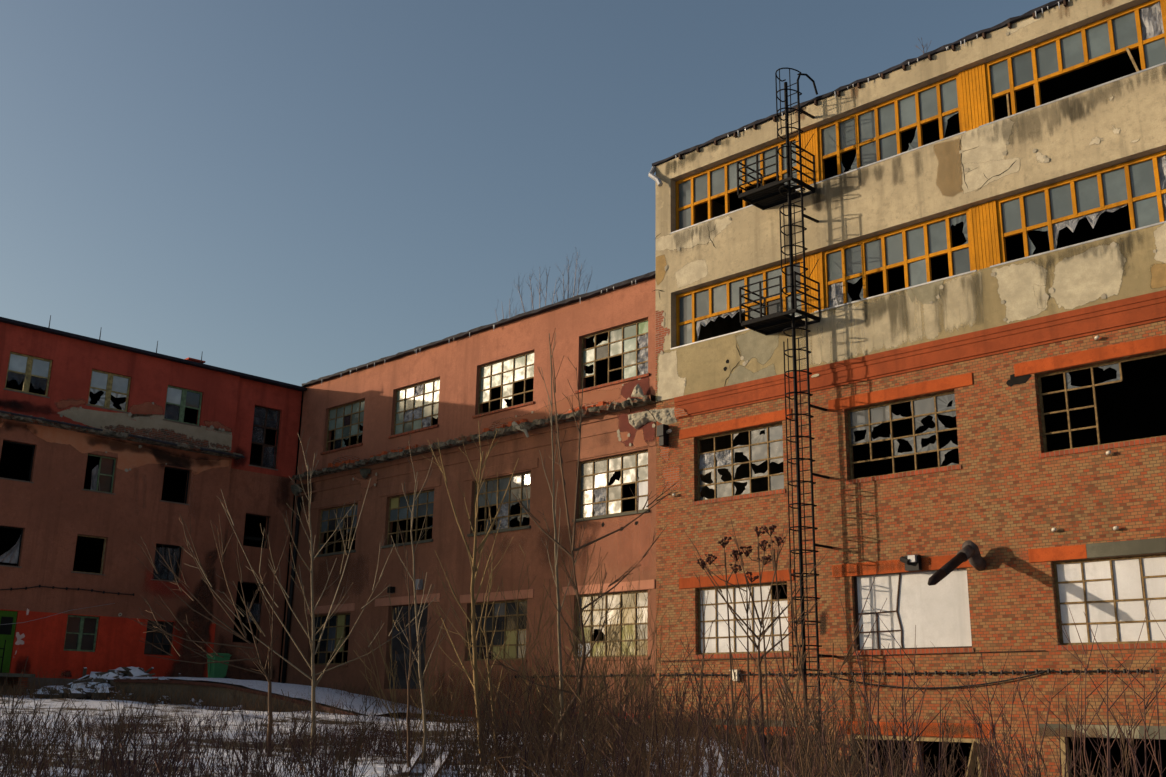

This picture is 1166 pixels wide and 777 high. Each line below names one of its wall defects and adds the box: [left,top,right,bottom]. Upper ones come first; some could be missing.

crack [959,135,1016,192]
peeling [959,118,1020,193]
peeling [1153,223,1166,263]
damp [804,272,982,364]
peeling [991,242,1126,323]
peeling [483,350,688,448]
spalling [26,407,232,475]
peeling [1071,725,1139,738]